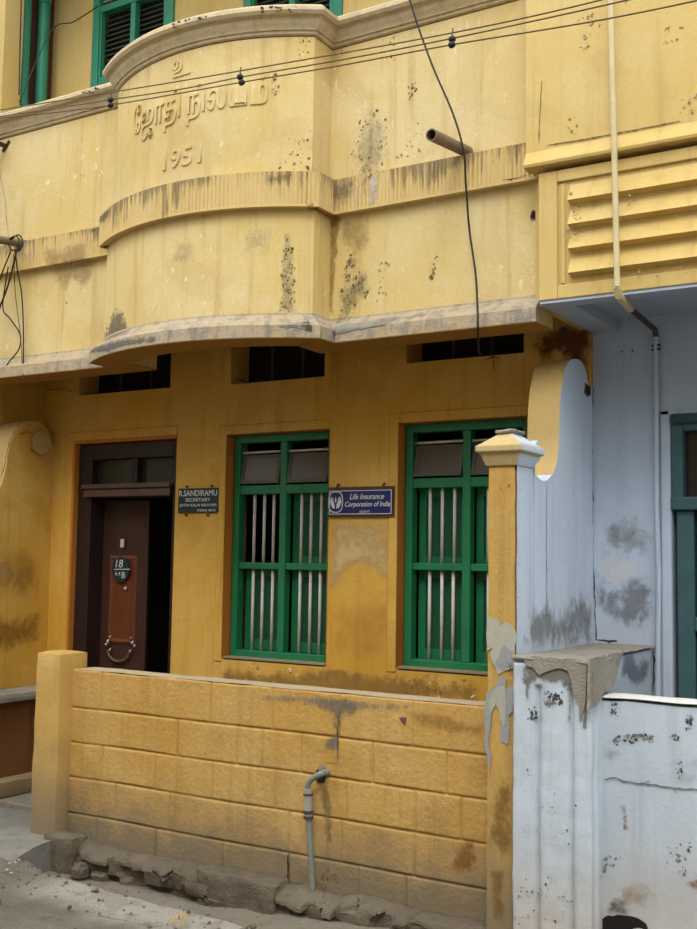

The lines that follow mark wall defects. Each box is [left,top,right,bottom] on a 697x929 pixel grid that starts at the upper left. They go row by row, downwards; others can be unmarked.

water stain [309,204,364,306]
water stain [600,580,649,622]
water stain [530,603,591,643]
water stain [623,654,649,682]
water stain [225,671,443,749]
peeling [461,616,521,773]
flaking render [529,691,563,720]
crack [604,777,697,794]